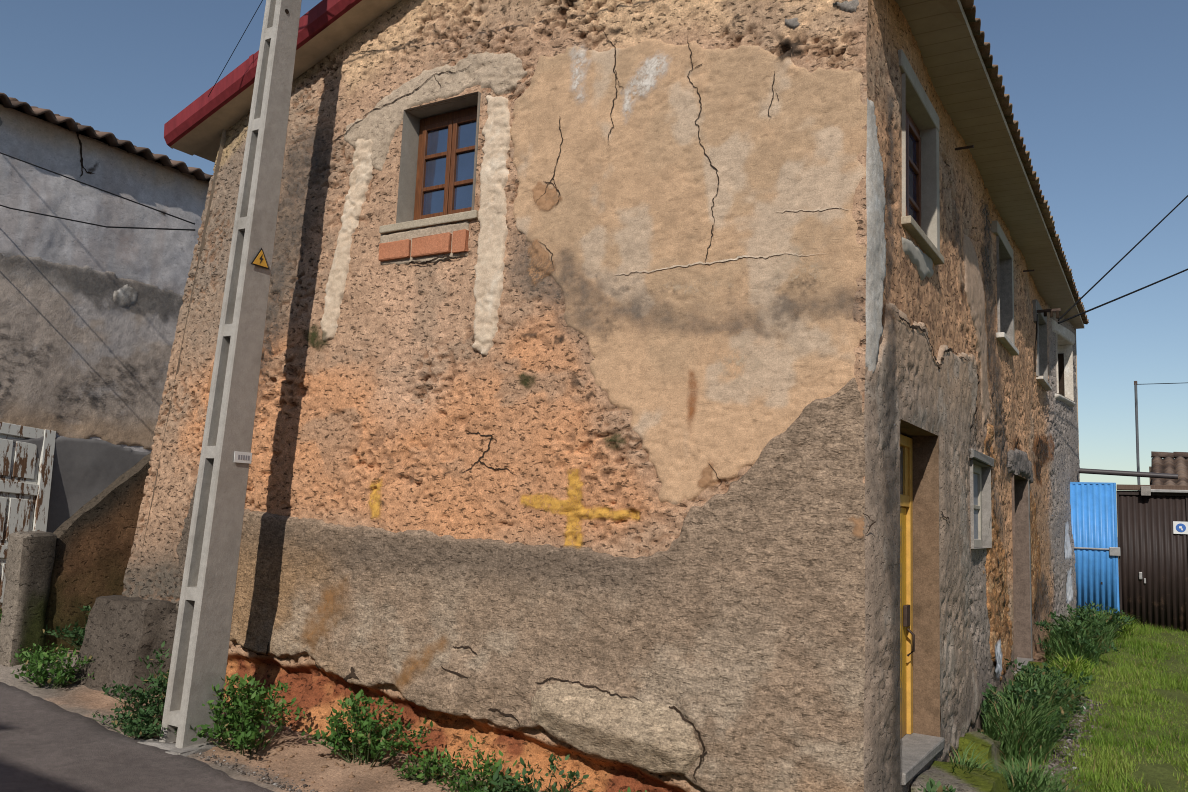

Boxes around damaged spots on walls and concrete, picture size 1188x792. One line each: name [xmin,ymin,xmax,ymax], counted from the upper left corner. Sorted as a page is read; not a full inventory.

spalling [833,0,859,12]
crack [539,119,563,207]
crack [604,32,622,155]
crack [687,41,719,263]
water stain [62,266,183,321]
peeling [320,139,373,342]
water stain [57,364,136,418]
peeling [472,18,1013,792]
crack [896,312,979,455]
spalling [1015,435,1054,622]
crack [535,677,641,701]
crack [669,706,707,783]